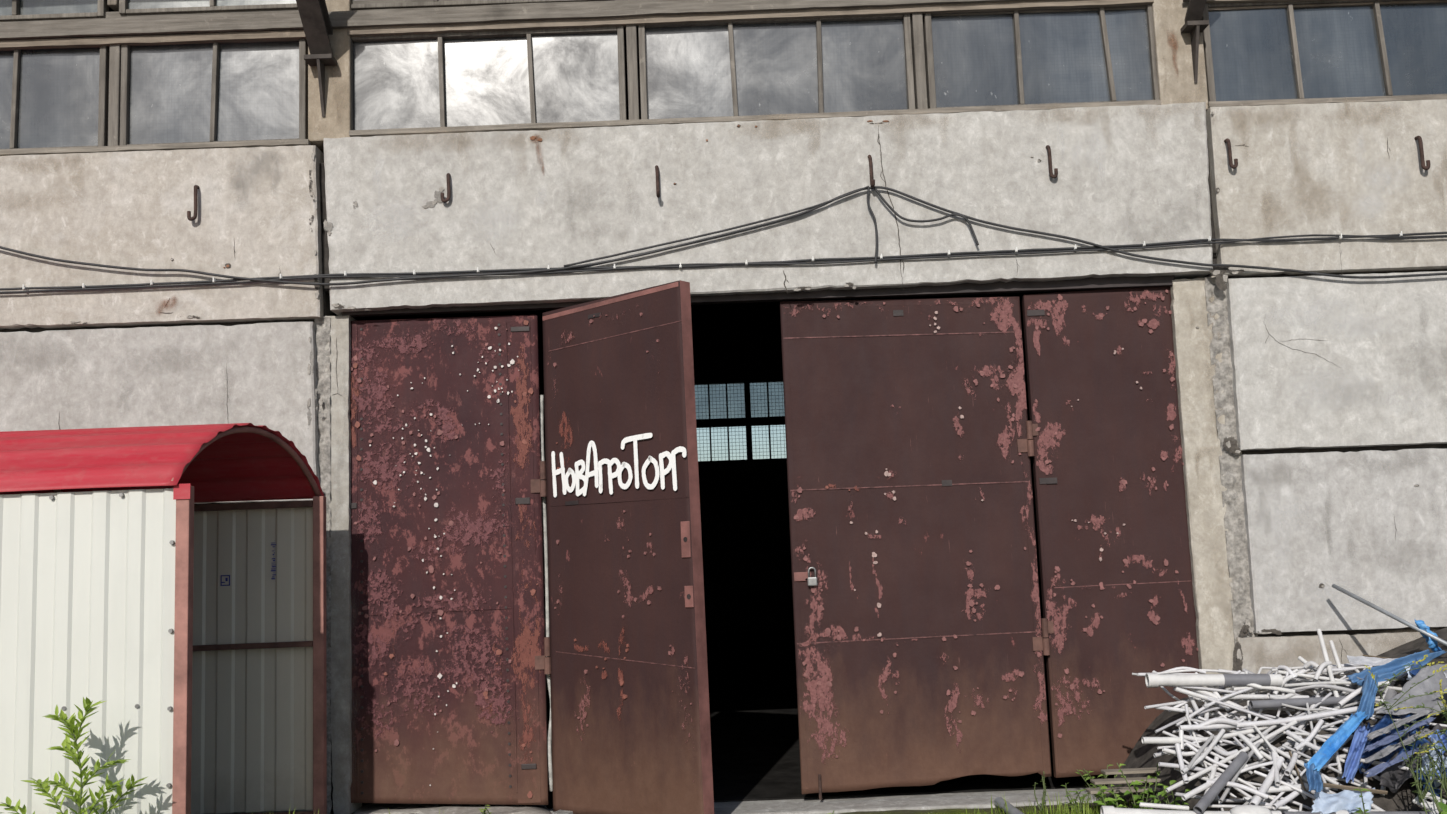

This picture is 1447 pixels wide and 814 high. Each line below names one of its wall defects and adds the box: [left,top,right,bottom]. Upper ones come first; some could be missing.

peeling [784,282,885,319]
peeling [350,319,541,764]
peeling [791,484,917,763]
peeling [884,468,897,501]
peeling [918,290,1187,751]
peeling [1181,632,1198,662]